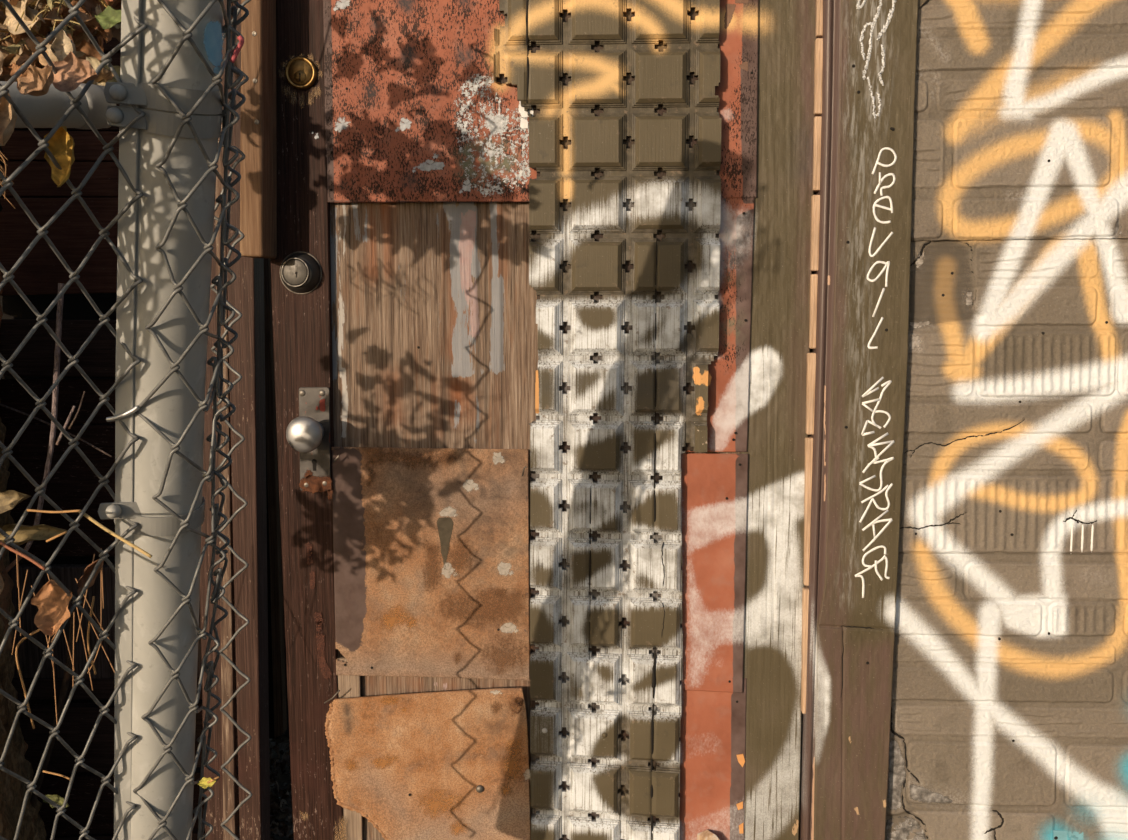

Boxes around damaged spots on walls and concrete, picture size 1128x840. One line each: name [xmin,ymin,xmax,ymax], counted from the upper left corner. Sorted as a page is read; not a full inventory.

peeling [454,73,531,197]
crack [905,420,1024,457]
rust [298,470,333,501]
crack [900,514,964,530]
spalling [886,740,952,840]